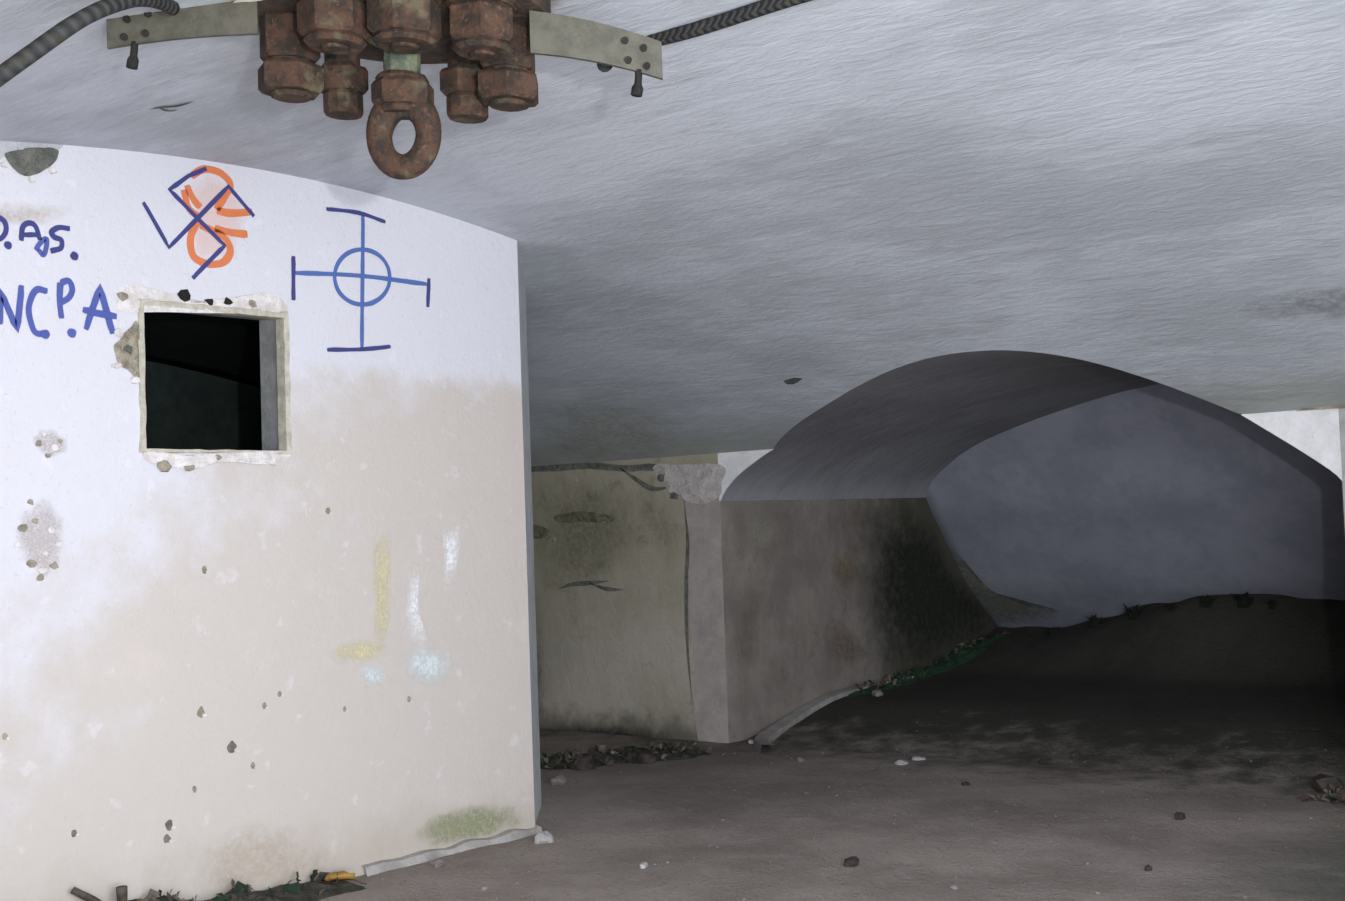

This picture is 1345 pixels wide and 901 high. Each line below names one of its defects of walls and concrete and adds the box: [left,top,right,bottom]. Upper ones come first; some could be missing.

flaking render [0,141,63,183]
flaking render [111,285,288,384]
peeling [35,432,63,458]
flaking render [143,451,291,472]
peeling [14,499,63,581]
water stain [446,536,457,572]